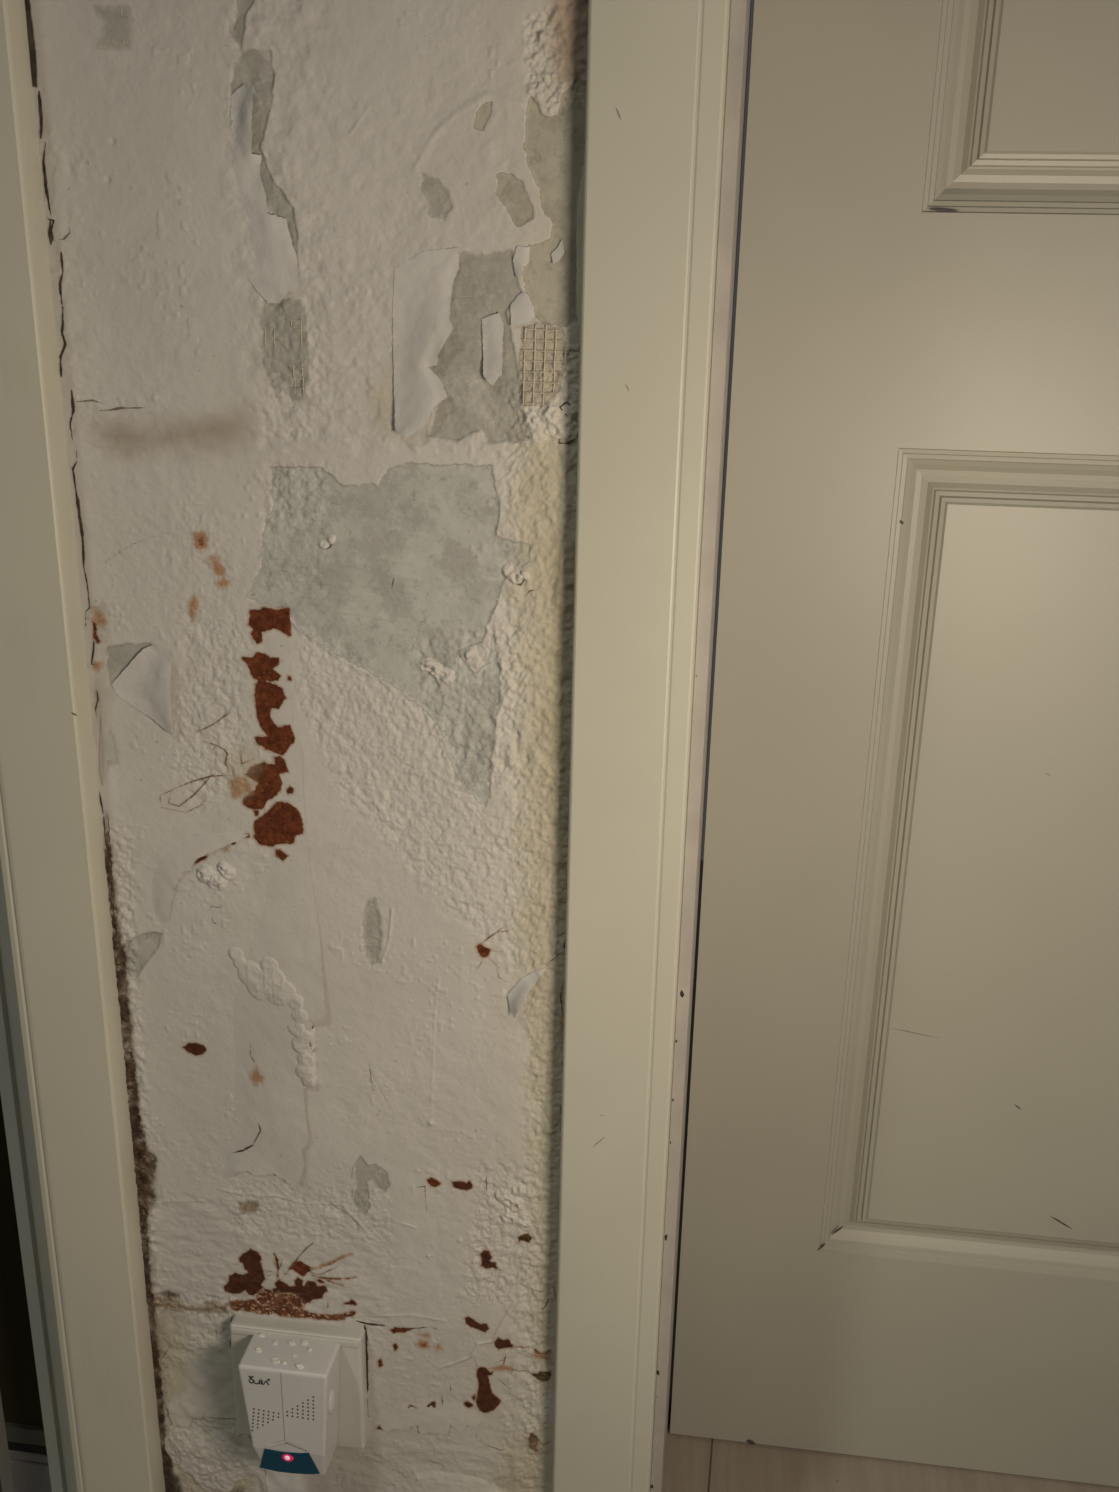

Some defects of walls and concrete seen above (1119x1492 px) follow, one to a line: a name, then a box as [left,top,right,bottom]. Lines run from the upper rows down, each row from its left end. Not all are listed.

peeling [230,0,298,303]
flaking render [392,78,586,443]
crack [38,91,155,711]
peeling [107,643,173,735]
rust [225,607,304,861]
crack [100,795,113,872]
flaking render [223,462,531,1186]
rust [182,1042,207,1056]
rust [427,1177,473,1191]
rust [223,1243,357,1321]
rust [464,1316,551,1413]